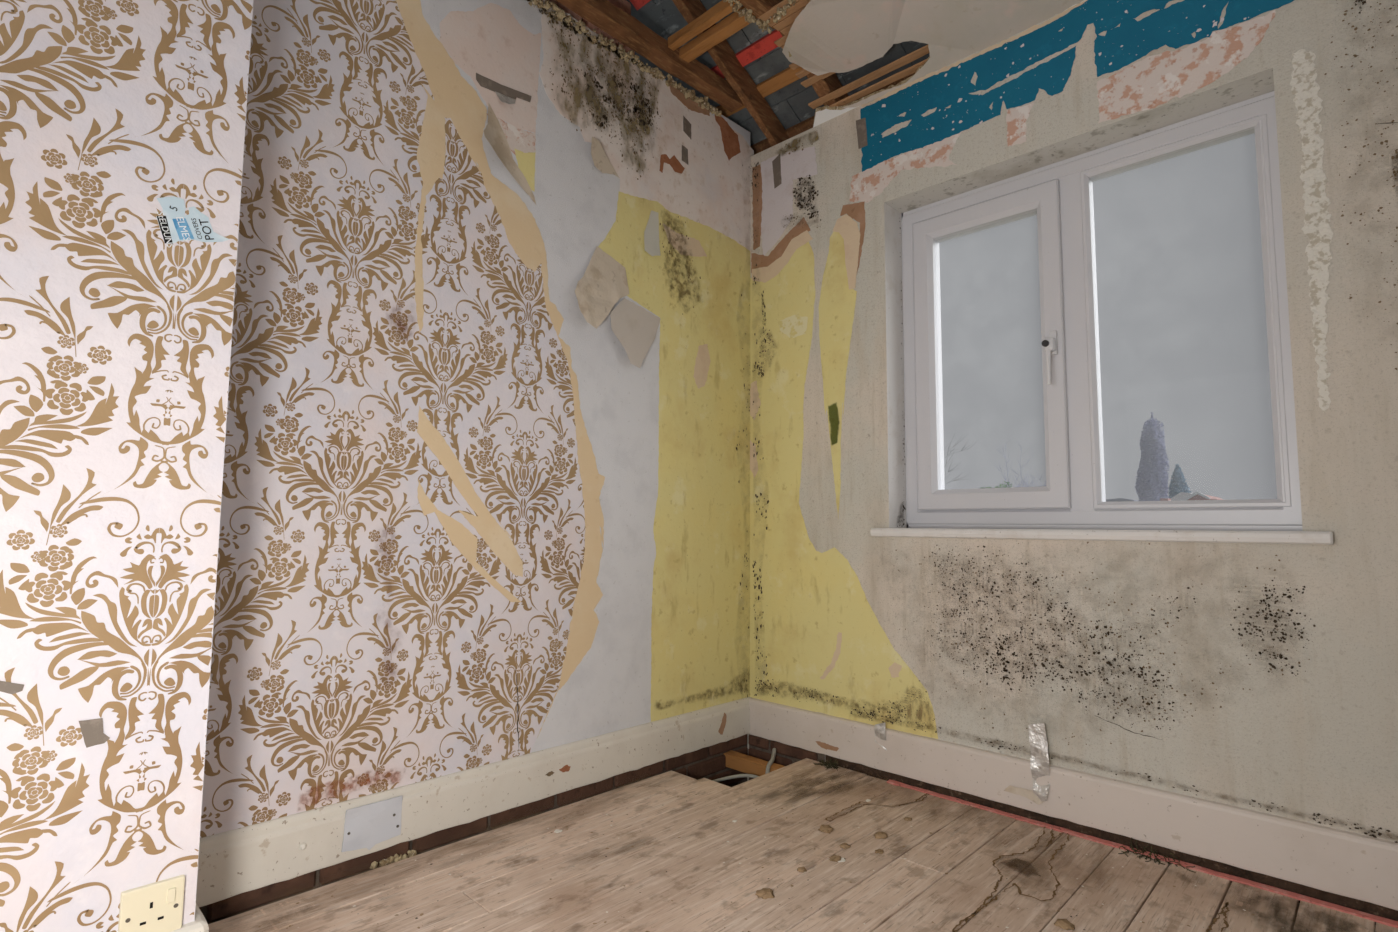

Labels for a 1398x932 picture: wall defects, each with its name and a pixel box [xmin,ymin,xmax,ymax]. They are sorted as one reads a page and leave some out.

leakage [527,0,661,180]
flaking render [440,0,818,283]
flaking render [782,0,1103,271]
flaking render [1096,5,1276,123]
leakage [1324,0,1398,325]
leakage [741,264,773,416]
leakage [721,554,957,733]
leakage [896,542,1251,751]
leakage [1230,555,1316,676]
leakage [1313,813,1398,843]